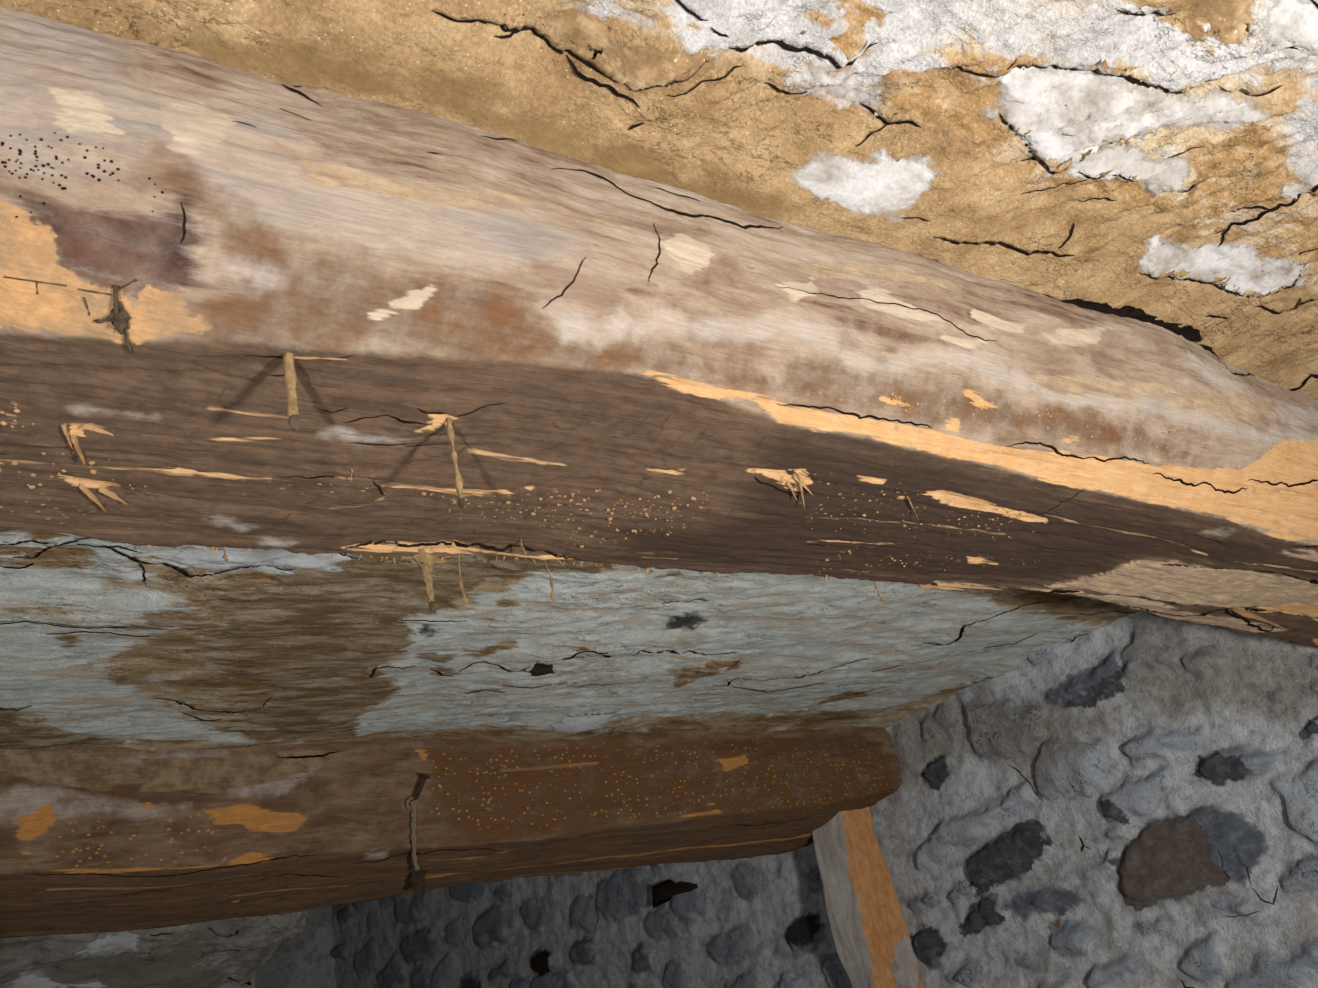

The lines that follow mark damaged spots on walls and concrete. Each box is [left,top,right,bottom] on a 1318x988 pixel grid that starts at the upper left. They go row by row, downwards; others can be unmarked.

crack [1119,4,1177,17]
crack [432,0,877,131]
crack [953,55,1282,97]
crack [856,99,921,147]
crack [902,112,1138,257]
crack [1169,146,1204,193]
crack [1139,184,1318,319]
crack [779,287,997,341]
crack [778,404,933,428]
crack [0,536,295,582]